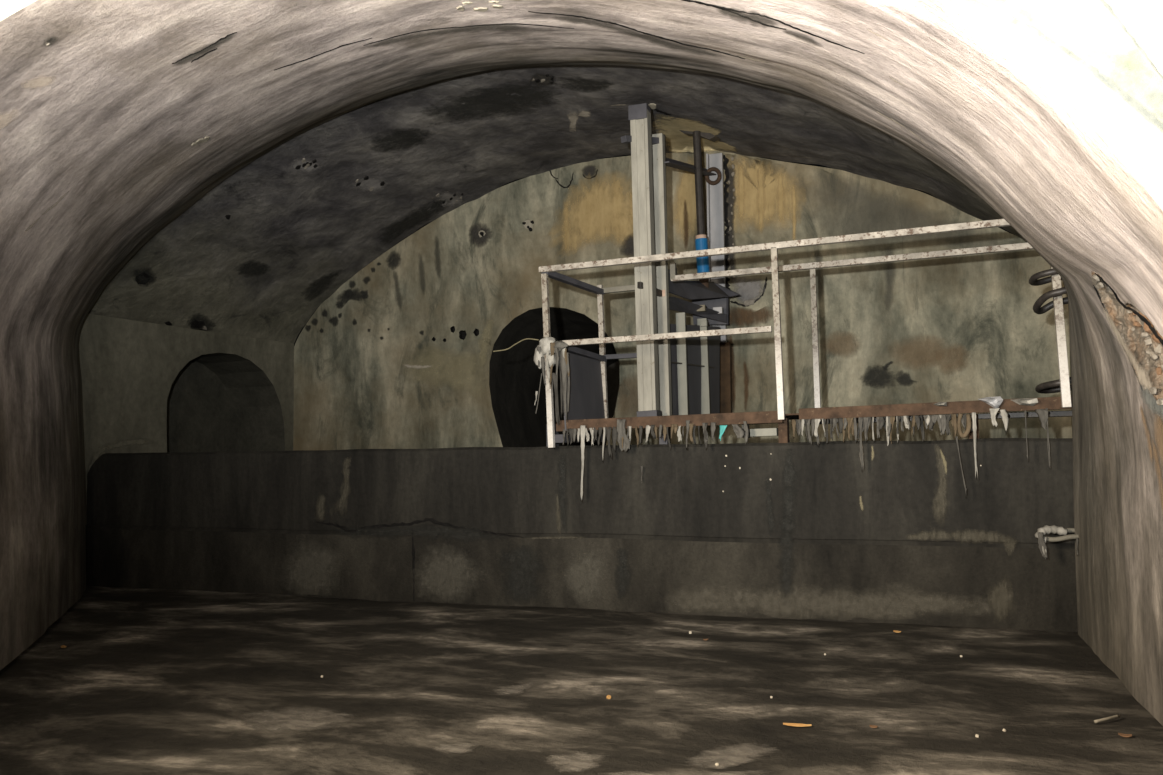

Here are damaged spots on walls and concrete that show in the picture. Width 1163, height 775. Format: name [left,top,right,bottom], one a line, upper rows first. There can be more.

crack [682,0,865,54]
spalling [1092,271,1163,415]